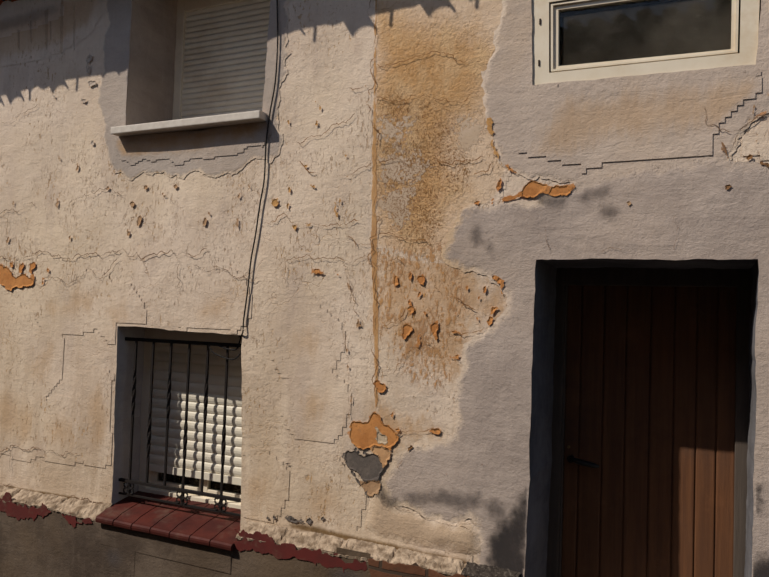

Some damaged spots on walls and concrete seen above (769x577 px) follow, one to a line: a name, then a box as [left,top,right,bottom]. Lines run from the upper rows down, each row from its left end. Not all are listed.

crack [705,110,767,145]
crack [268,0,492,409]
peeling [342,0,576,497]
peeling [0,261,49,291]
crack [2,248,256,294]
peeling [0,492,51,521]
peeling [62,512,93,528]
leakage [487,496,526,577]
leakage [753,559,769,577]